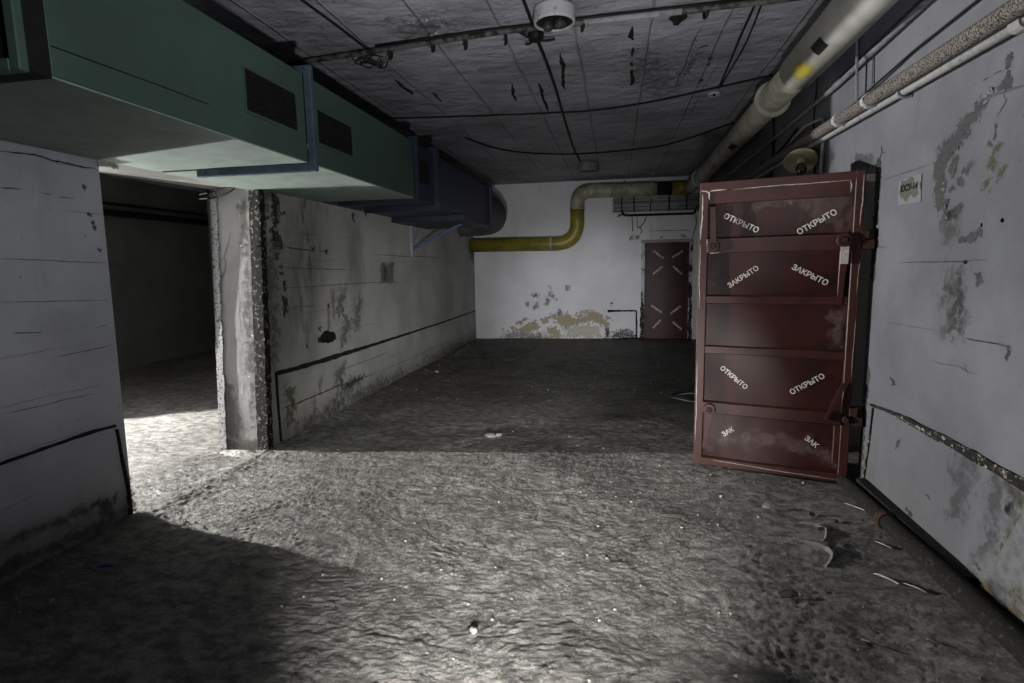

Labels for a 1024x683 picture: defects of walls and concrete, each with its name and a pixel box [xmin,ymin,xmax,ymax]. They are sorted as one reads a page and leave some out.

flaking render [932,52,1013,221]
flaking render [958,223,983,243]
peeling [500,302,613,339]